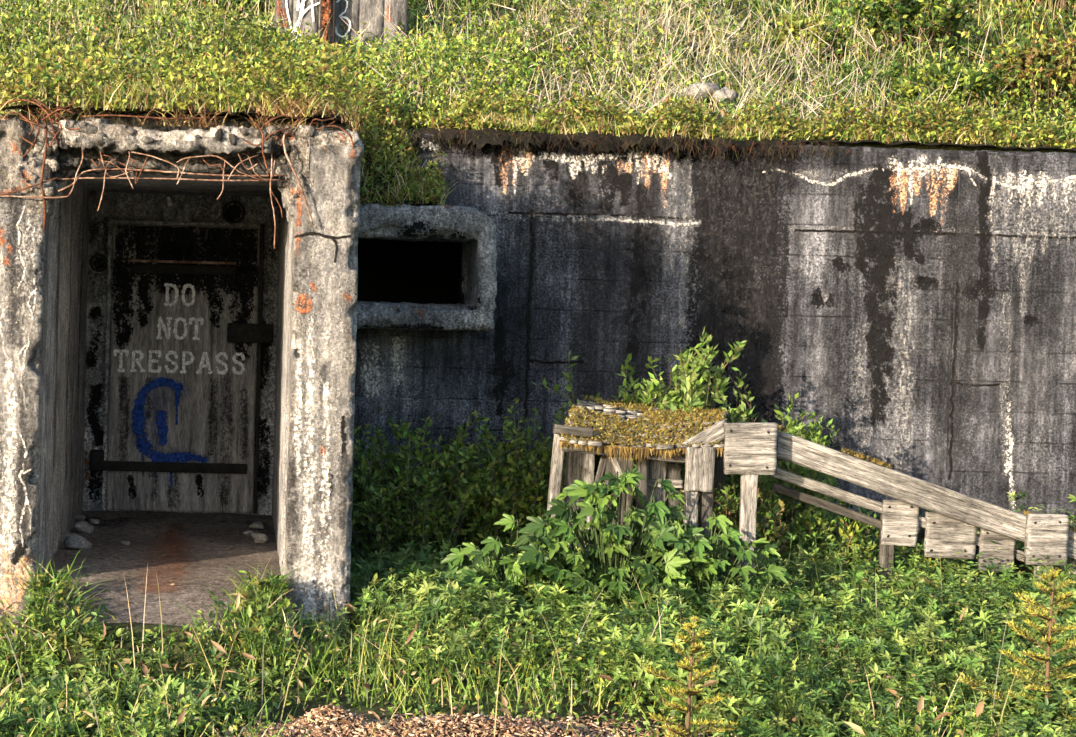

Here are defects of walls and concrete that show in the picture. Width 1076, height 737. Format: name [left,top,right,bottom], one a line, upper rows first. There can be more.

rust [500,145,534,194]
rust [617,149,672,202]
rust [890,156,957,215]
rust [291,187,302,255]
rust [295,282,318,313]
leakage [830,162,926,426]
leakage [949,151,1073,465]
leakage [1004,404,1016,508]
rust [0,543,30,616]